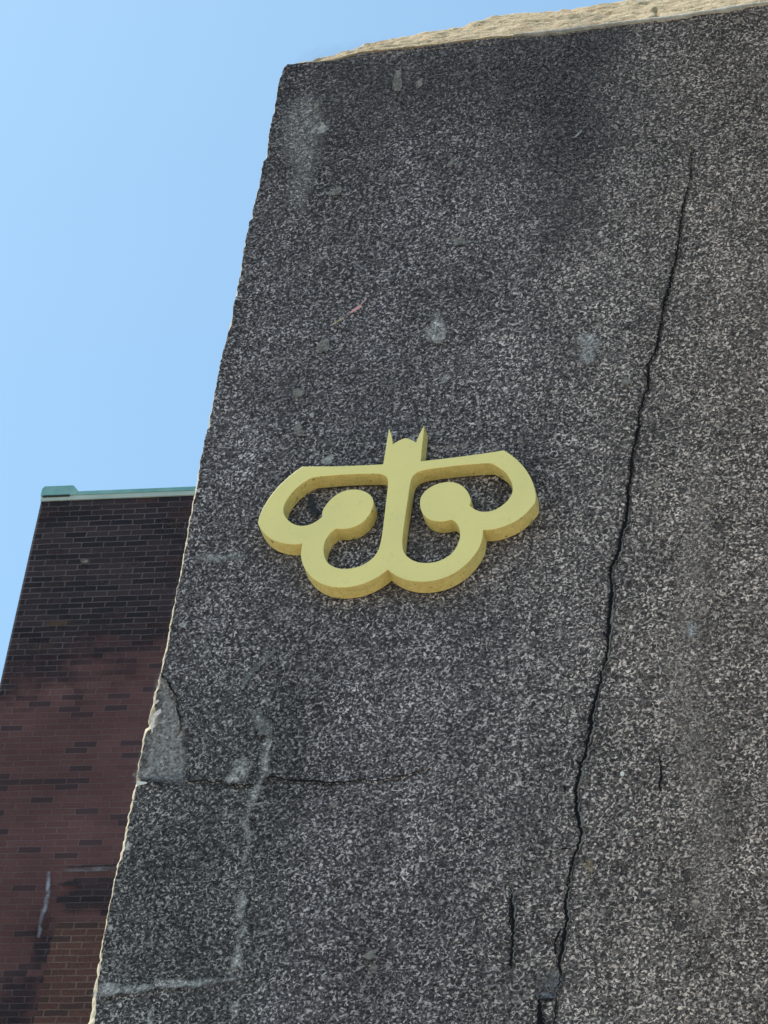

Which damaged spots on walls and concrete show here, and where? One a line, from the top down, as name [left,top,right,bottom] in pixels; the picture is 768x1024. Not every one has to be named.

crack [537,149,693,1024]
spalling [137,672,187,785]
crack [149,768,427,786]
crack [508,884,517,968]